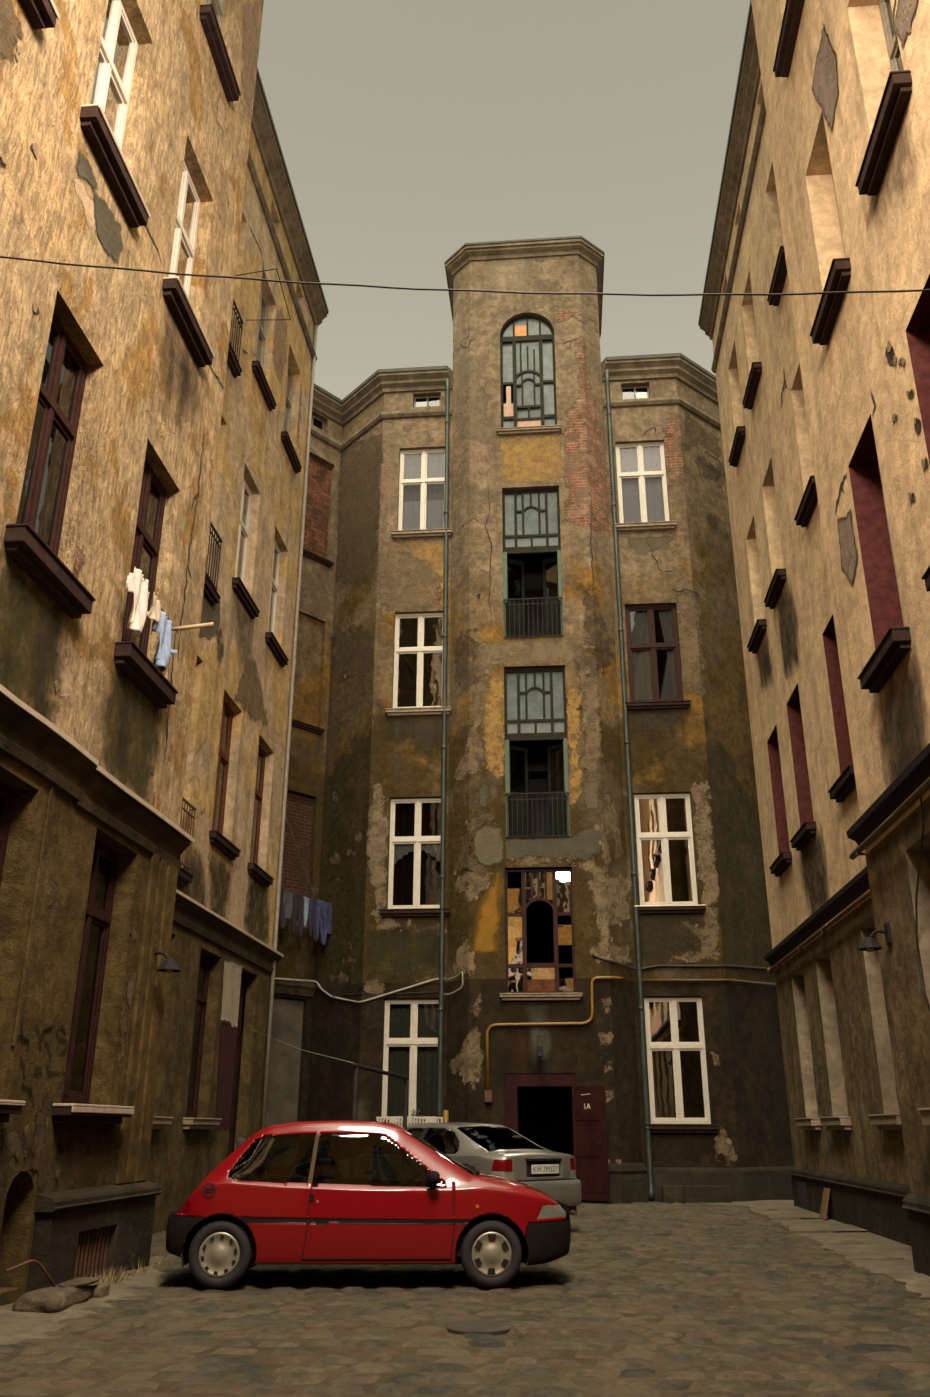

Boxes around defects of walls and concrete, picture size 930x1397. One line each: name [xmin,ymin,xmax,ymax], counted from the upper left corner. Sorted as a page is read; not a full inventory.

flaking render [73,176,96,234]
flaking render [554,306,613,533]
flaking render [662,411,721,486]
crack [164,432,205,758]
flaking render [328,782,448,936]
flaking render [451,807,502,902]
flaking render [509,661,633,964]
flaking render [670,780,722,964]
flaking render [452,938,477,976]
flaking render [450,994,486,1093]
flaking render [711,1126,739,1166]